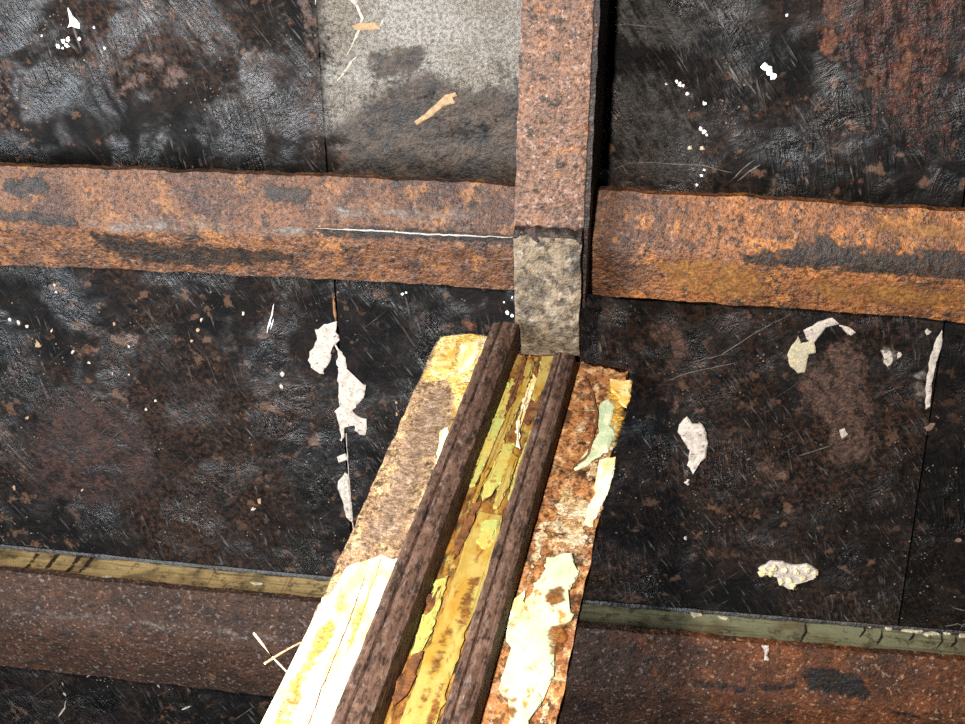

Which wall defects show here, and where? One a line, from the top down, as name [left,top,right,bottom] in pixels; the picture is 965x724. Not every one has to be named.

leakage [331,39,519,183]
corrosion [3,177,50,198]
corrosion [89,231,304,267]
corrosion [265,184,310,204]
corrosion [660,236,965,308]
peeling [308,295,367,529]
peeling [422,318,487,463]
peeling [678,416,708,485]
spalling [787,318,877,468]
peeling [499,376,632,724]
peeling [261,554,397,724]
corrosion [801,667,870,701]